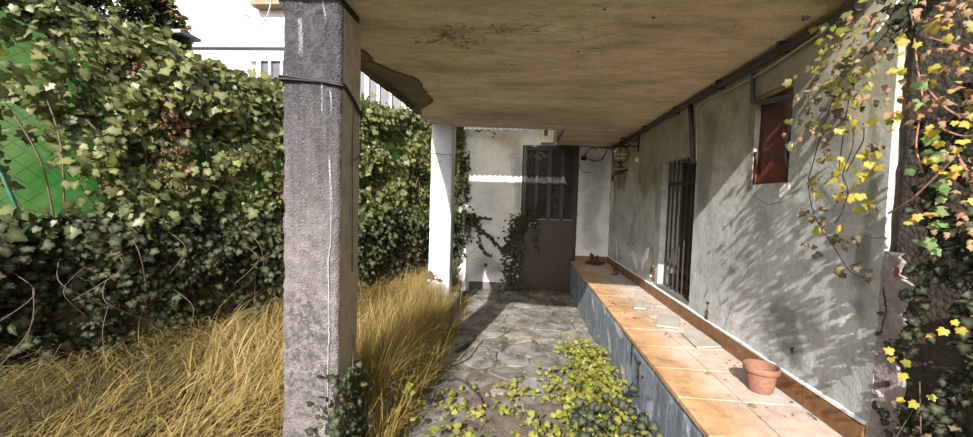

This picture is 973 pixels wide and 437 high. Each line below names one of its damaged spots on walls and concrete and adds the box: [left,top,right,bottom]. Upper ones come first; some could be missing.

flaking render [361,49,434,115]